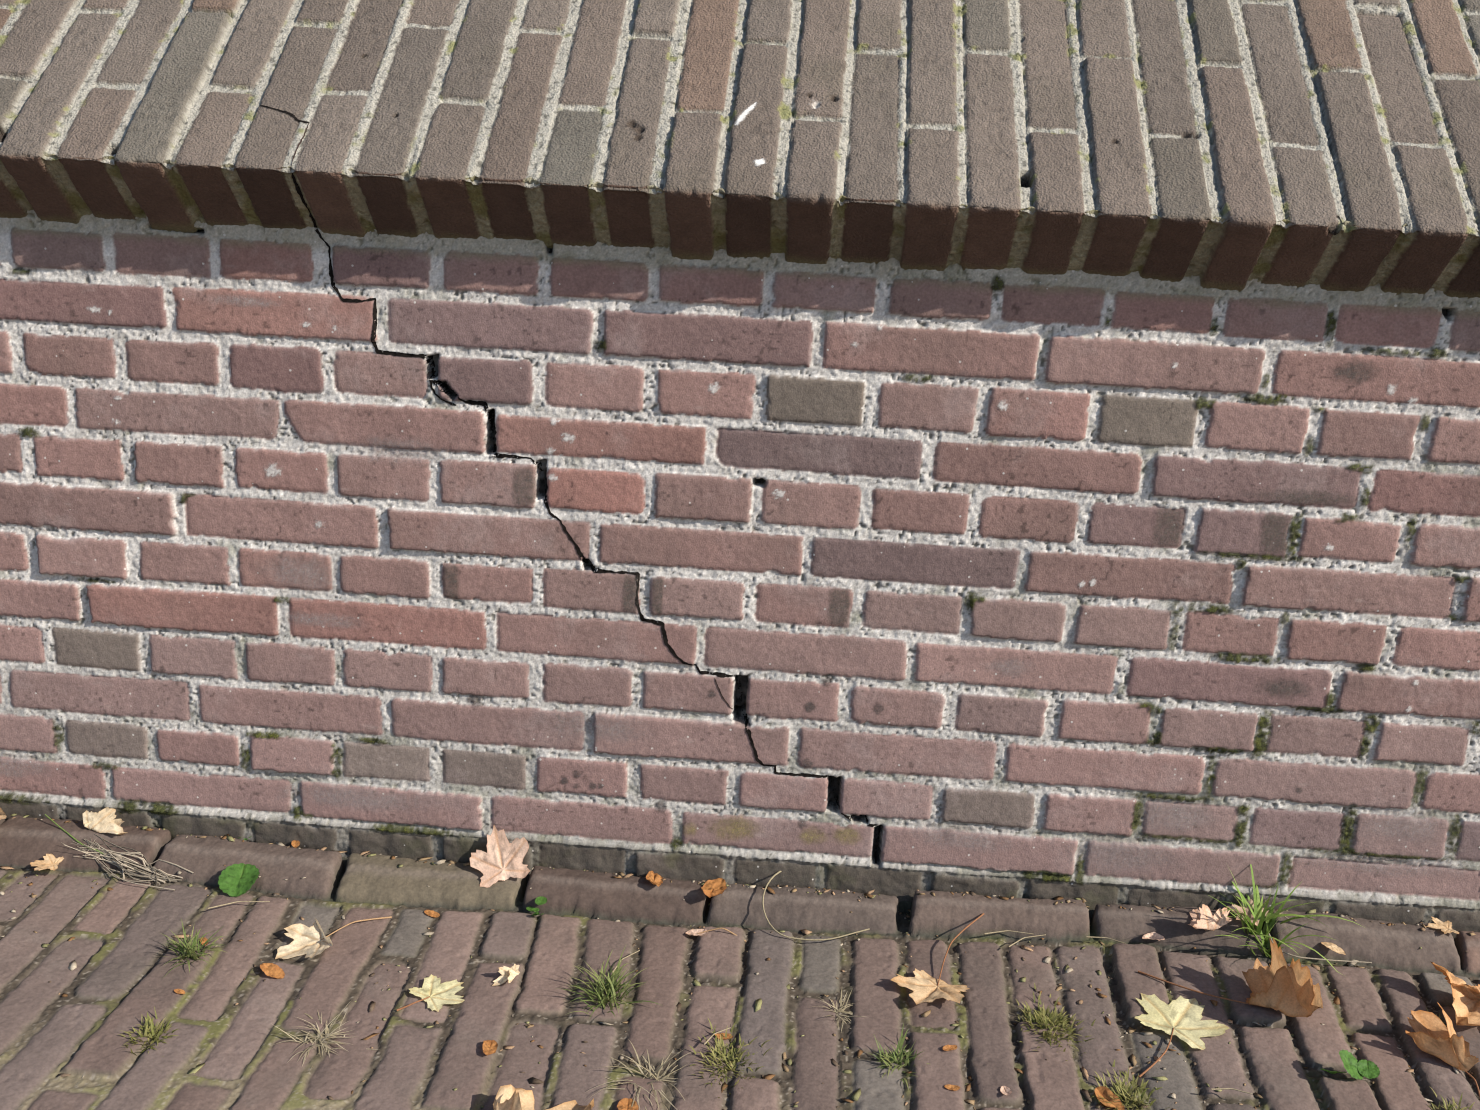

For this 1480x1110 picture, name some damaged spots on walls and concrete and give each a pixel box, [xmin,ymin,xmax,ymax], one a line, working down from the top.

crack [260,105,882,864]